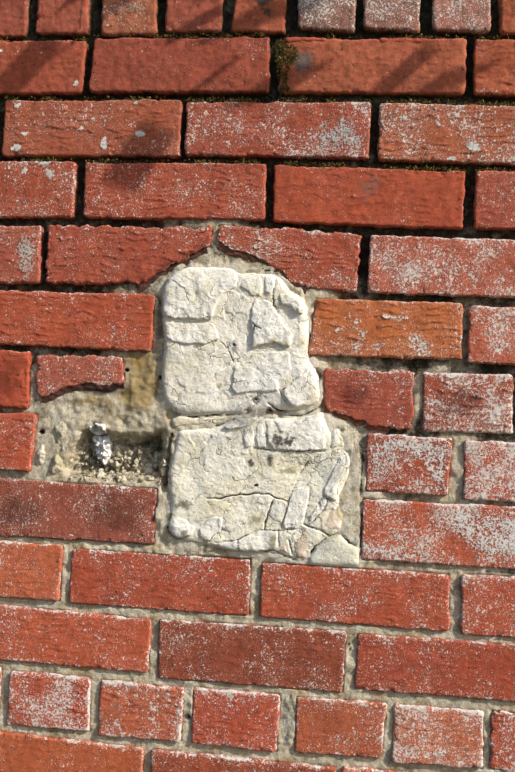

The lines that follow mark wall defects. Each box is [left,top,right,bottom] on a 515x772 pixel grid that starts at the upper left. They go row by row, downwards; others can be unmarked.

spalling [42,383,124,403]
crack [268,378,321,416]
crack [207,445,365,561]
leakage [362,544,433,563]
leakage [425,506,515,567]